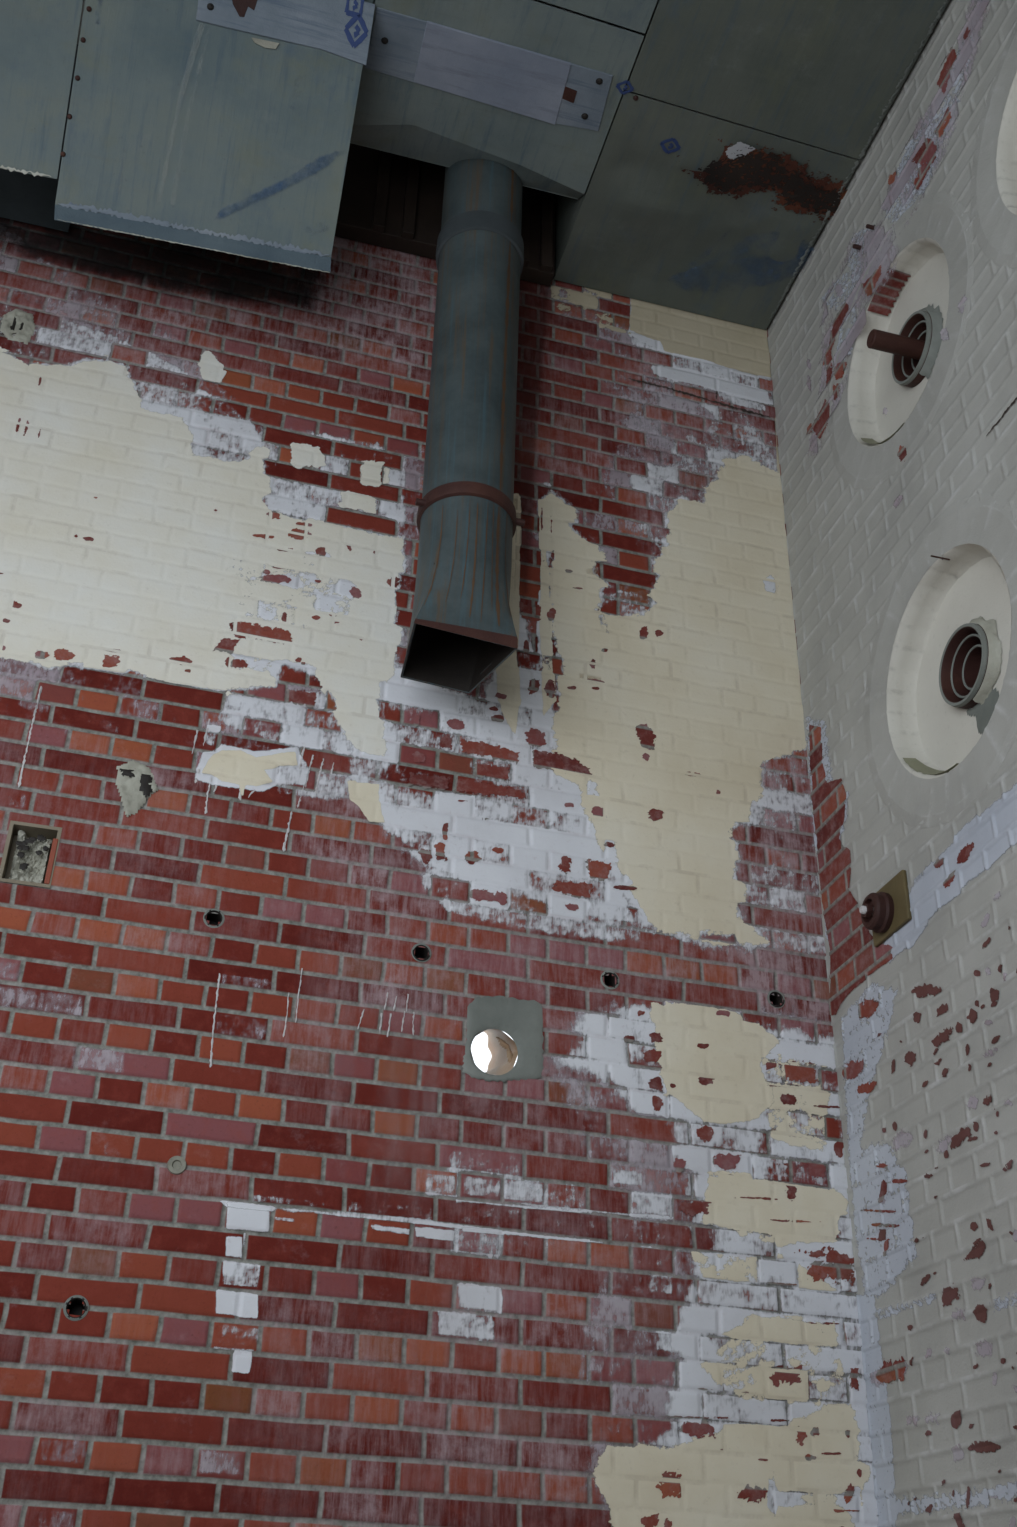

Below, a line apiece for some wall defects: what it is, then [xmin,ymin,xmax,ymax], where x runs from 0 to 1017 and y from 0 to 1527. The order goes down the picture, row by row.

rust [677,134,848,223]
peeling [0,233,19,291]
peeling [0,286,1017,1015]
peeling [911,965,1017,1077]
peeling [551,983,1017,1527]